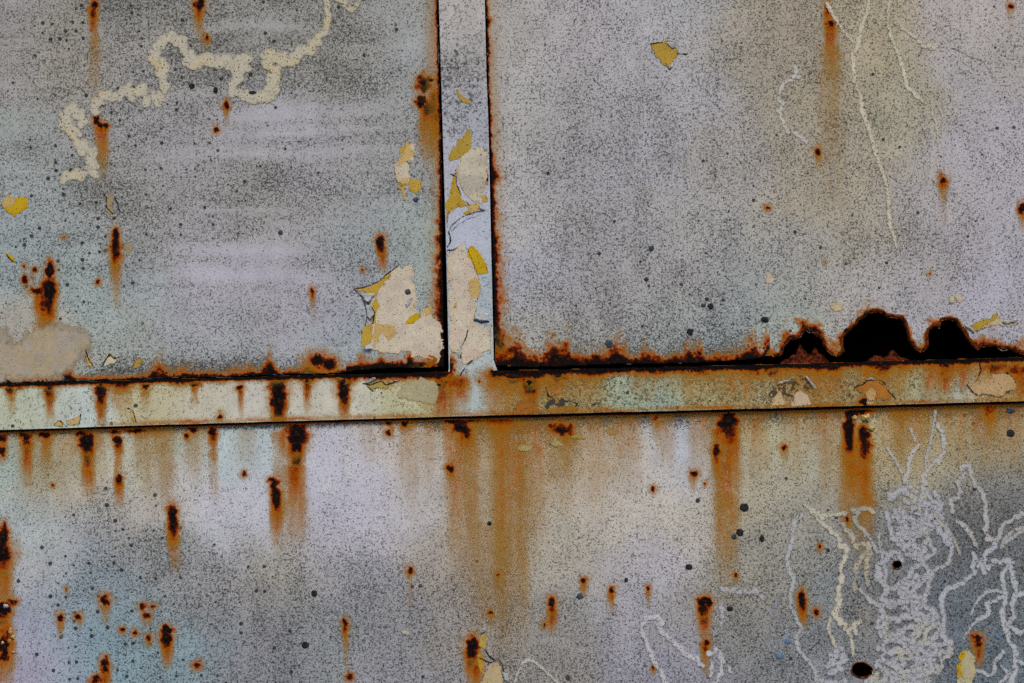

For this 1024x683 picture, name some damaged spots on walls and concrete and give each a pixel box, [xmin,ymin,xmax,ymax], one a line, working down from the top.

peeling [650,40,687,70]
peeling [394,141,422,201]
peeling [446,129,488,221]
rust [0,0,1024,535]
peeling [355,243,491,376]
peeling [967,362,1016,397]
rust [165,502,180,552]
rust [0,520,19,679]
rust [543,594,557,628]
rust [970,632,984,662]